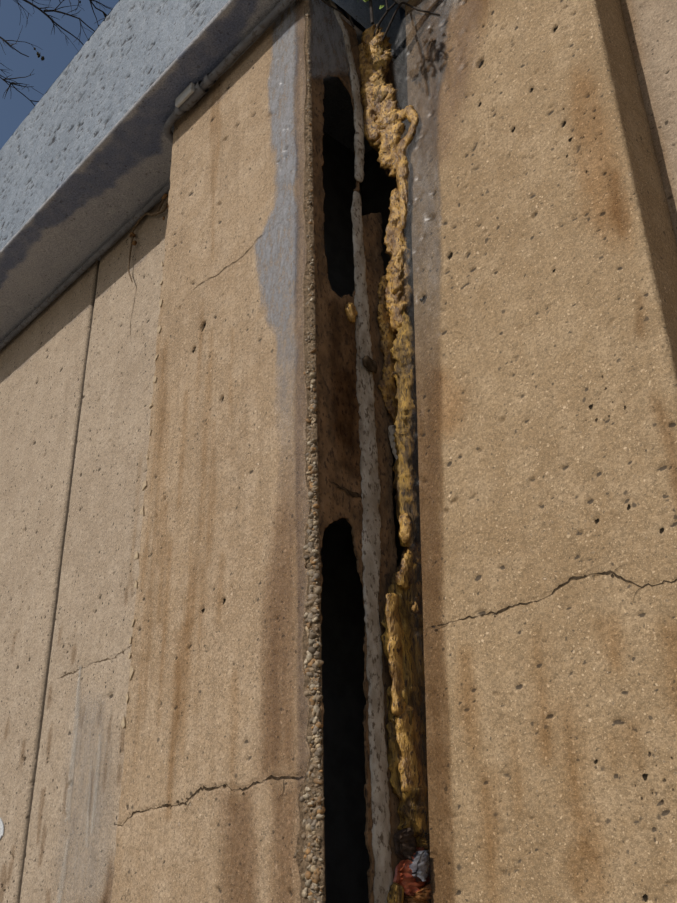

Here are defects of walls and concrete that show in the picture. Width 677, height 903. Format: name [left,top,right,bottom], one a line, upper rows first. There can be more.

crack [193,214,291,290]
spalling [294,2,326,903]
crack [431,565,677,628]
crack [115,775,305,826]